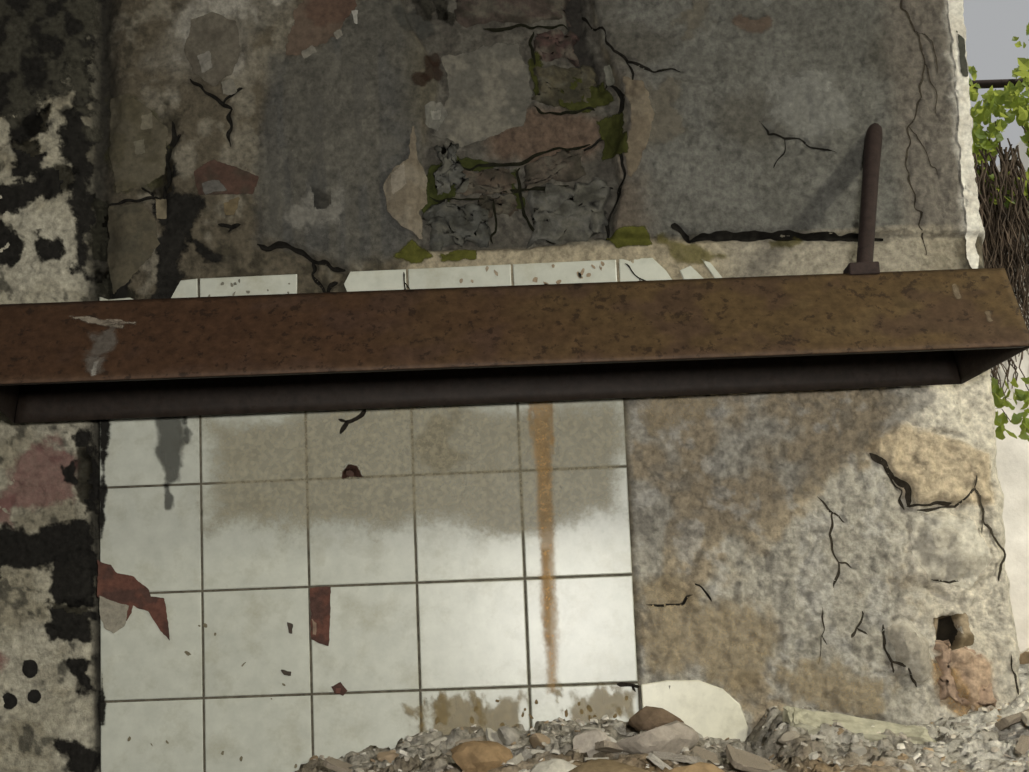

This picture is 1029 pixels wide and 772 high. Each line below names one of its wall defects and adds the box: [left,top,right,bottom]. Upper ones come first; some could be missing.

crack [582,17,680,114]
crack [190,79,243,147]
spalling [383,0,655,251]
crack [583,138,626,239]
crack [671,223,883,243]
crack [759,121,835,168]
water stain [156,416,189,509]
spalling [97,560,170,640]
spalling [310,586,331,646]
rust [531,401,555,690]
crack [817,496,851,661]
spalling [933,613,997,707]